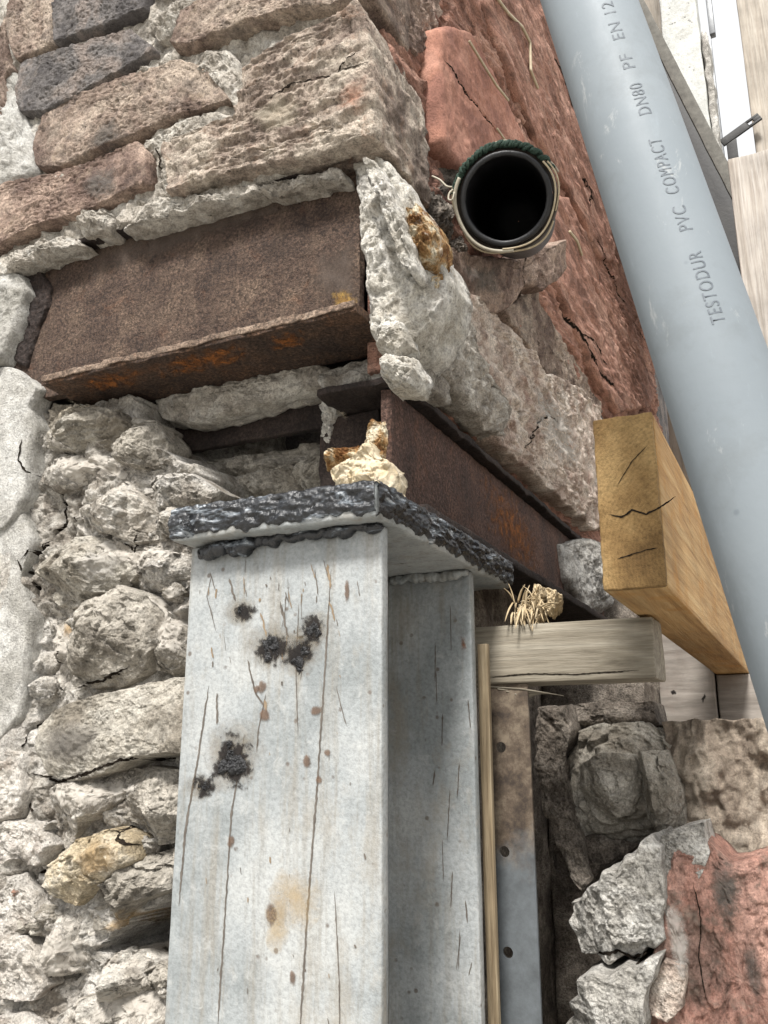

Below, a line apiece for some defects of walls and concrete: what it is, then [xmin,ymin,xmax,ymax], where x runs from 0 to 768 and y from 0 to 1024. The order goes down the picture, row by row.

crack [271,51,368,98]
crack [445,61,492,125]
crack [17,440,77,601]
crack [79,668,127,688]
crack [33,757,176,784]